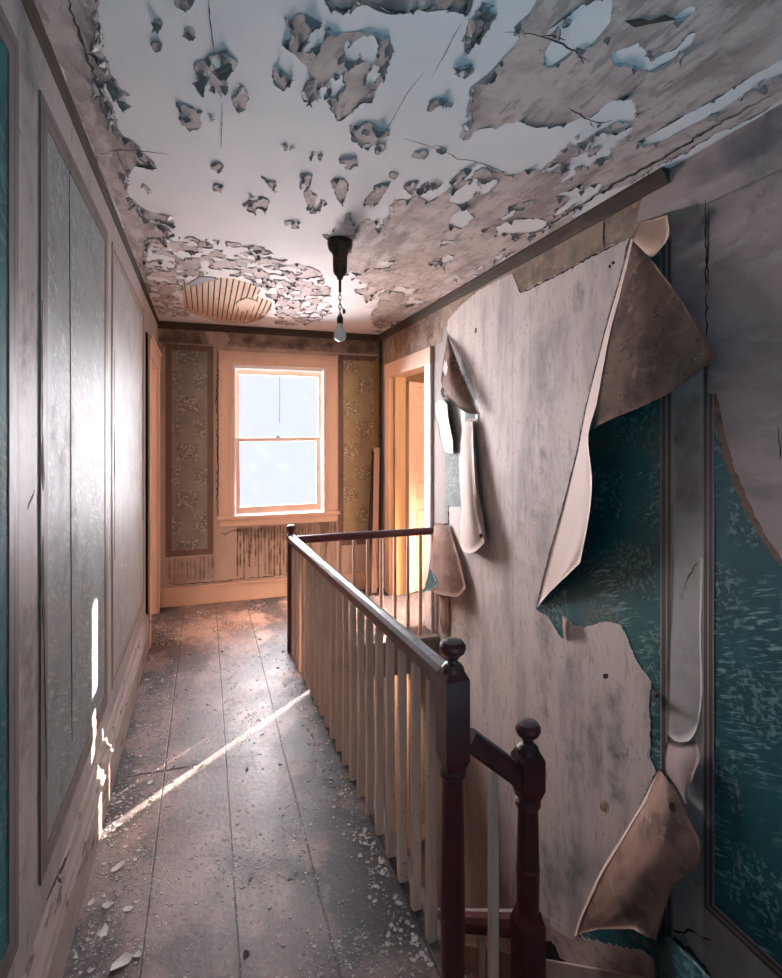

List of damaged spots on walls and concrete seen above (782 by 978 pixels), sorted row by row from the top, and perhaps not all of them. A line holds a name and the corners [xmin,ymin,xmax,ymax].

crack [68,0,169,169]
crack [505,32,589,64]
peeling [34,0,333,326]
peeling [271,0,782,333]
crack [702,200,710,337]
damp [237,526,303,577]
crack [673,928,711,978]